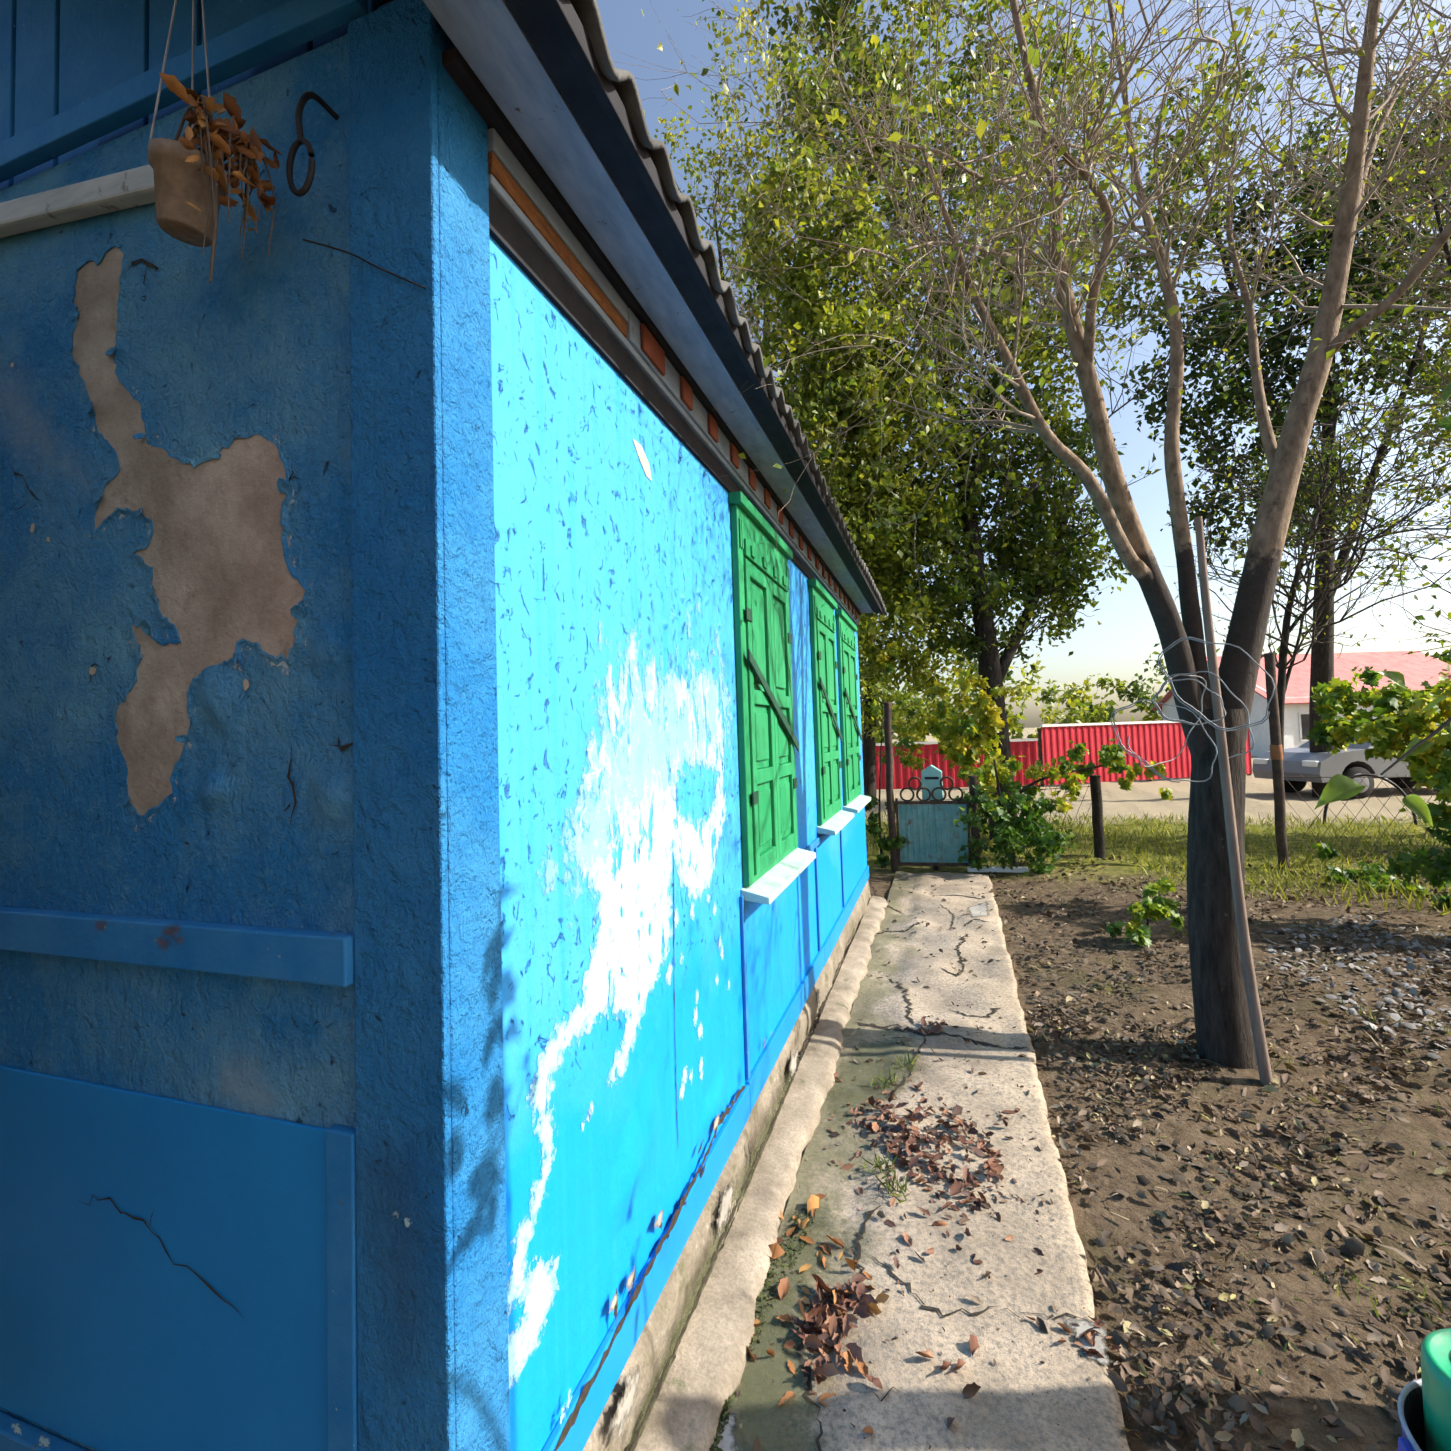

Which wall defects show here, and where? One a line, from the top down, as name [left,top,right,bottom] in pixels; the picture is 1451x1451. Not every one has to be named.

peeling [68,238,314,832]
crack [81,1194,243,1318]
peeling [507,603,733,1389]
crack [554,932,856,1451]